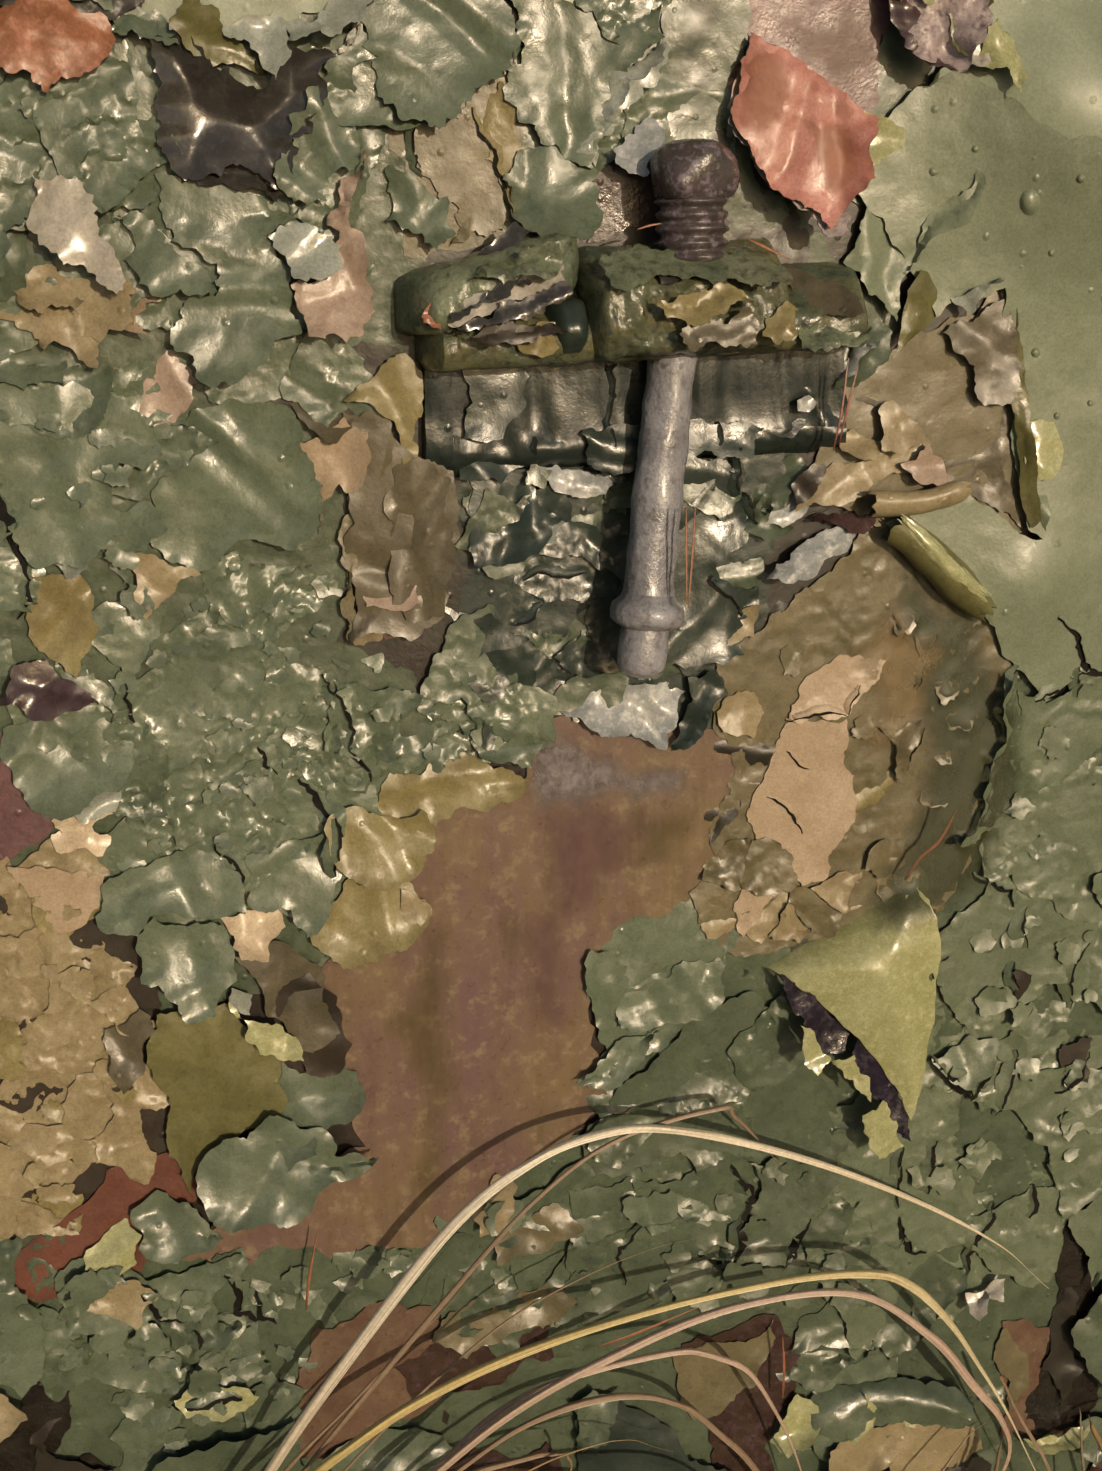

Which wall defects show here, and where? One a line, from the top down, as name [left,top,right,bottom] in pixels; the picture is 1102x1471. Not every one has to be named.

rust [745,54,785,125]
rust [817,127,850,186]
peeling [914,670,969,711]
crack [1004,616,1102,716]
peeling [0,0,866,1471]
crack [972,871,1029,992]
crack [1057,942,1090,1009]
crack [929,1050,1019,1117]
crack [1055,1051,1090,1094]
peeling [574,1278,1003,1471]